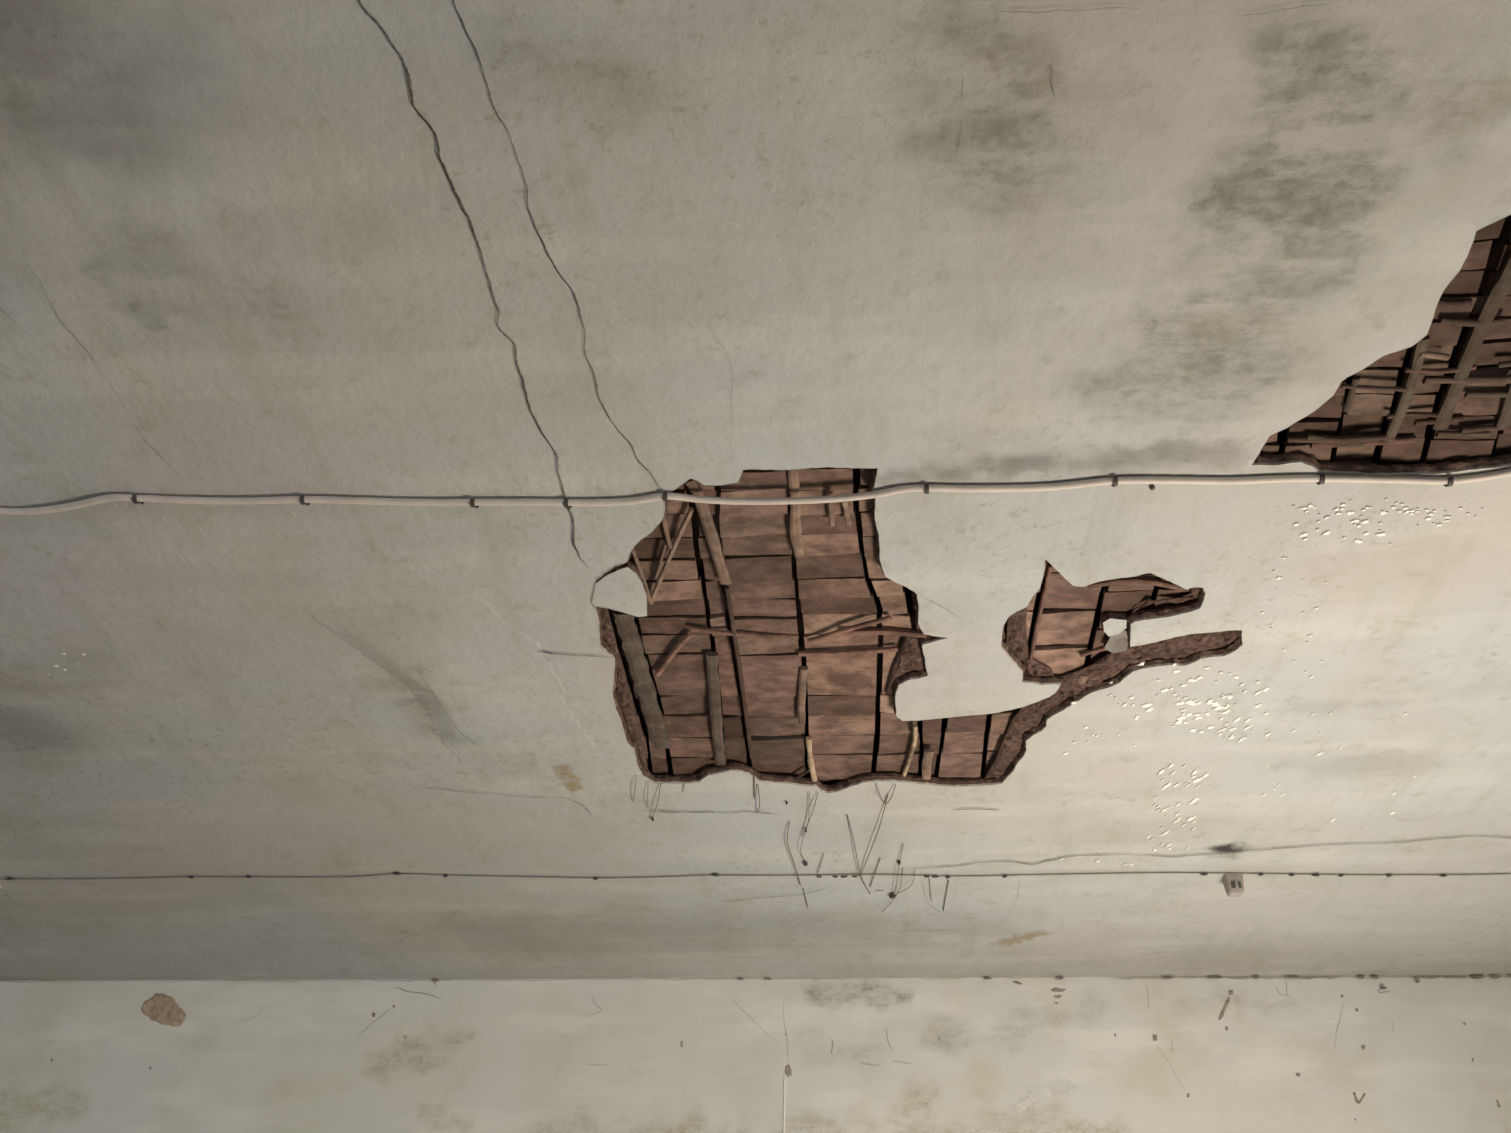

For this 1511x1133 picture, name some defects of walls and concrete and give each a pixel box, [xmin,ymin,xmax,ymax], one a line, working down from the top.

crack [358,0,584,562]
crack [453,0,654,479]
water stain [1203,162,1344,227]
spalling [1252,216,1511,475]
crack [660,808,757,816]
spalling [591,467,1271,911]
spalling [141,993,186,1027]